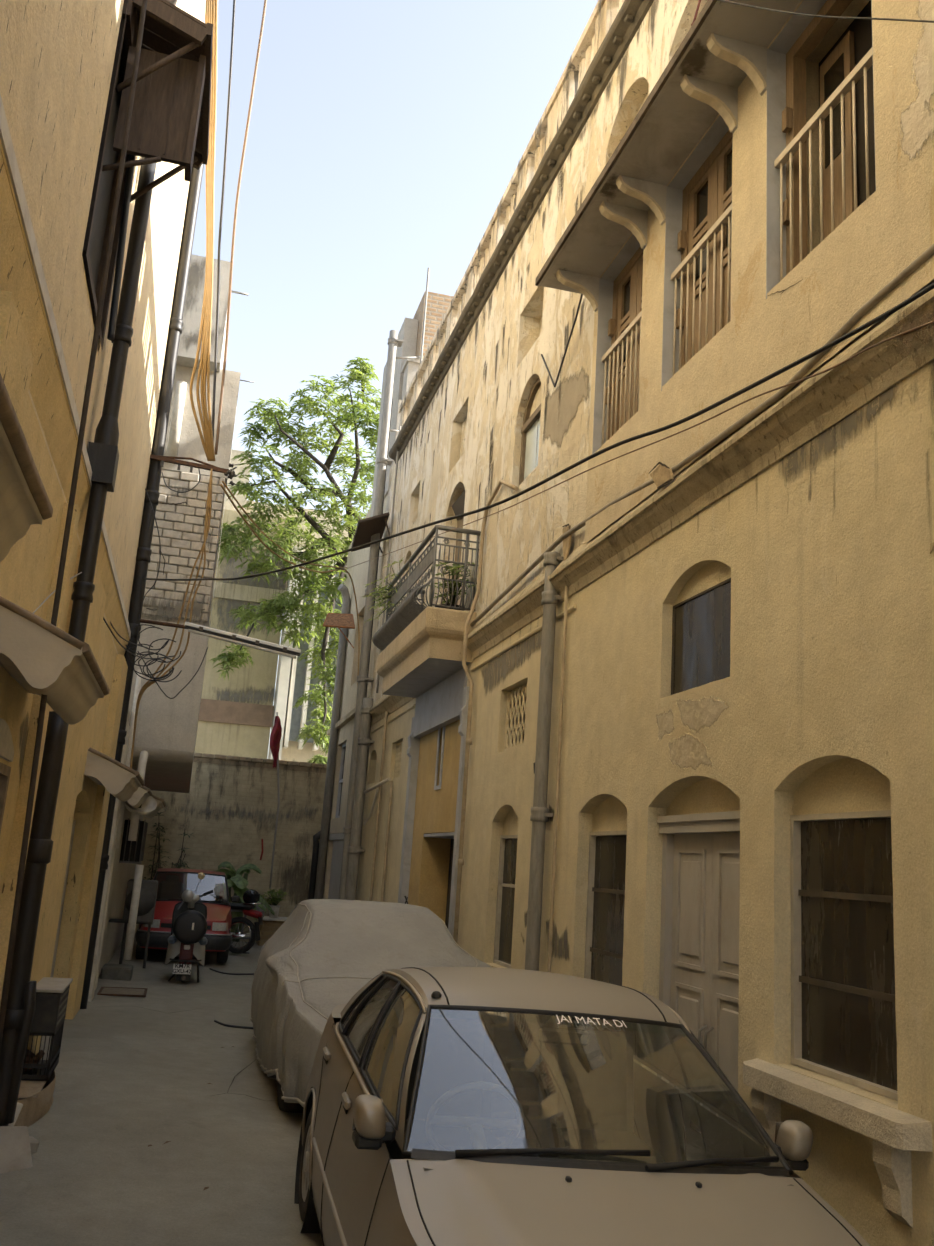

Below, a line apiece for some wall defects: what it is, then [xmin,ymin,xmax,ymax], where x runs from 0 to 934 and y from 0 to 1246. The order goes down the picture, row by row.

leakage [782,385,896,499]
leakage [482,617,542,693]